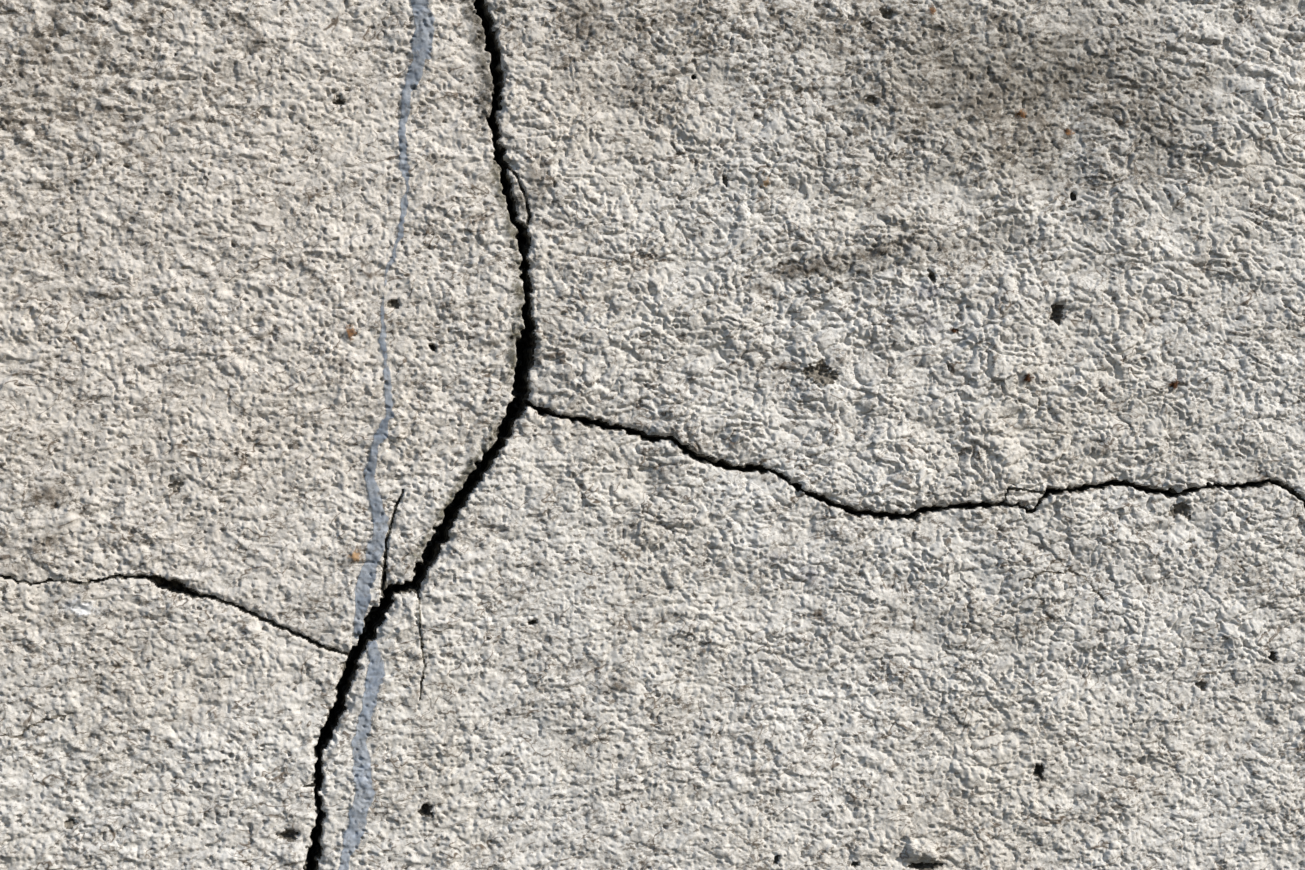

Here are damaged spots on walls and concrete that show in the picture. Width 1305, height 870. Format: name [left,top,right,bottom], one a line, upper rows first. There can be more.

crack [1283,305,1305,316]
crack [0,0,537,870]
crack [524,400,1305,521]
crack [1018,569,1106,604]